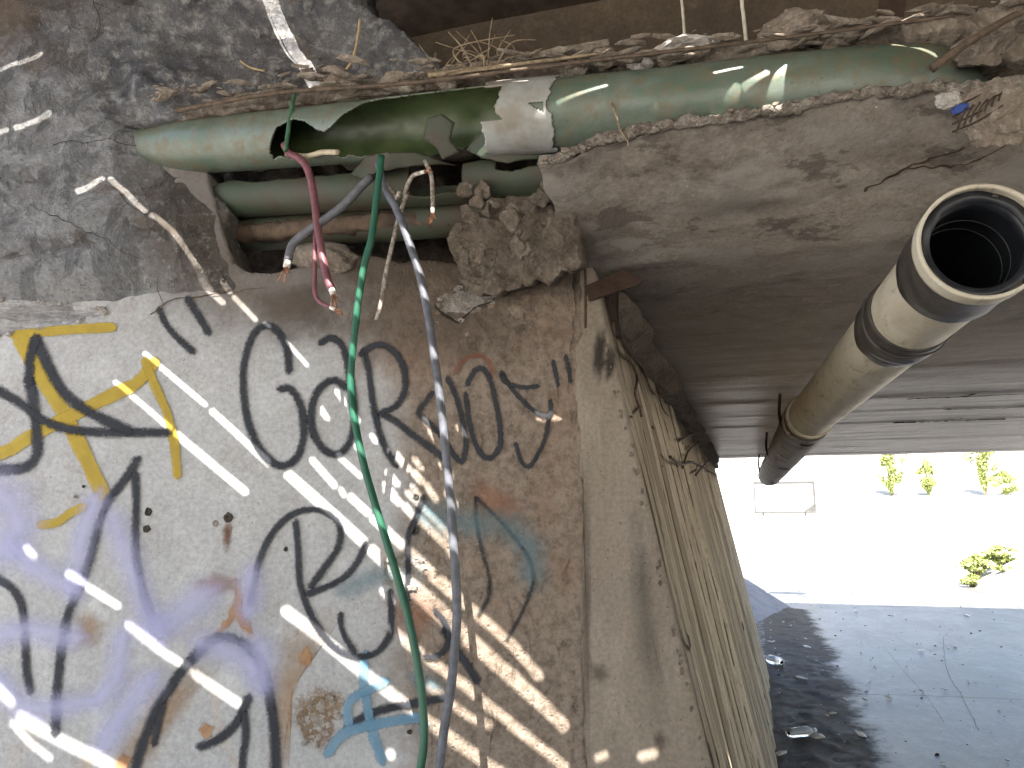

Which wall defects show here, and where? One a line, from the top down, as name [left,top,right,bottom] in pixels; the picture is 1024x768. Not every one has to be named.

spalling [549,78,987,167]
spalling [1001,75,1024,87]
crack [864,145,1006,192]
spalling [436,179,589,328]